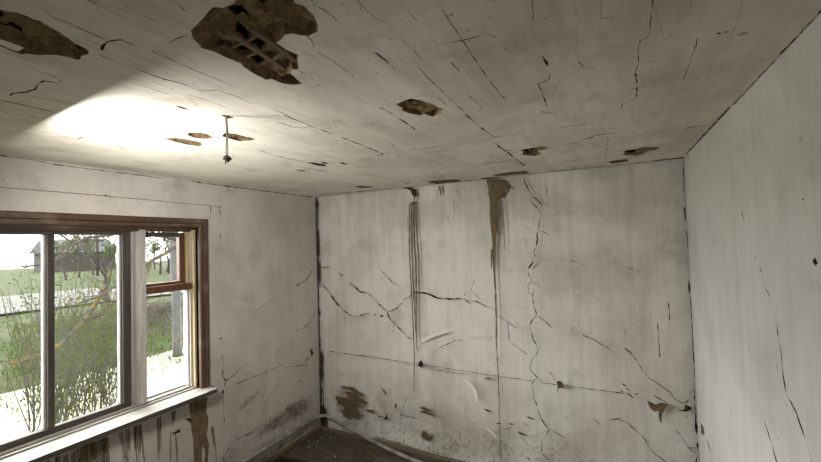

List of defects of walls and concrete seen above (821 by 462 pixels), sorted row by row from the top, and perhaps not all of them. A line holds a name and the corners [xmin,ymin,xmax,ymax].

flaking render [0,9,89,60]
flaking render [191,0,318,85]
crack [0,155,159,178]
flaking render [161,132,255,146]
crack [56,18,440,158]
flaking render [389,96,445,117]
crack [191,0,821,462]
damp [407,204,424,374]
damp [487,179,511,462]
damp [125,424,145,462]
damp [189,397,217,462]
flaking render [647,395,692,423]